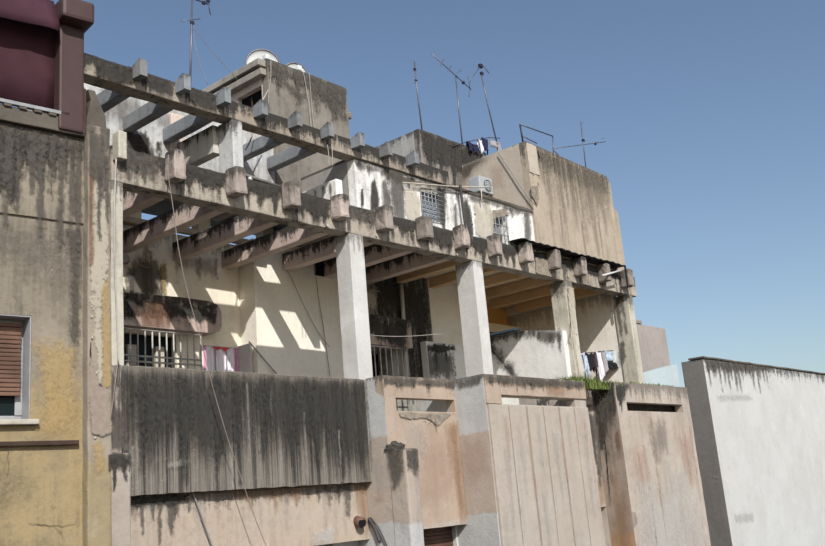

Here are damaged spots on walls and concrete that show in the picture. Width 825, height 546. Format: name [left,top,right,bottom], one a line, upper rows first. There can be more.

water stain [269,62,349,122]
water stain [0,126,162,343]
peeling [89,183,112,439]
water stain [123,255,217,324]
water stain [561,258,574,279]
water stain [369,277,629,488]
water stain [705,359,771,392]
water stain [108,368,372,515]
flaking render [399,412,451,426]
water stain [130,494,191,544]